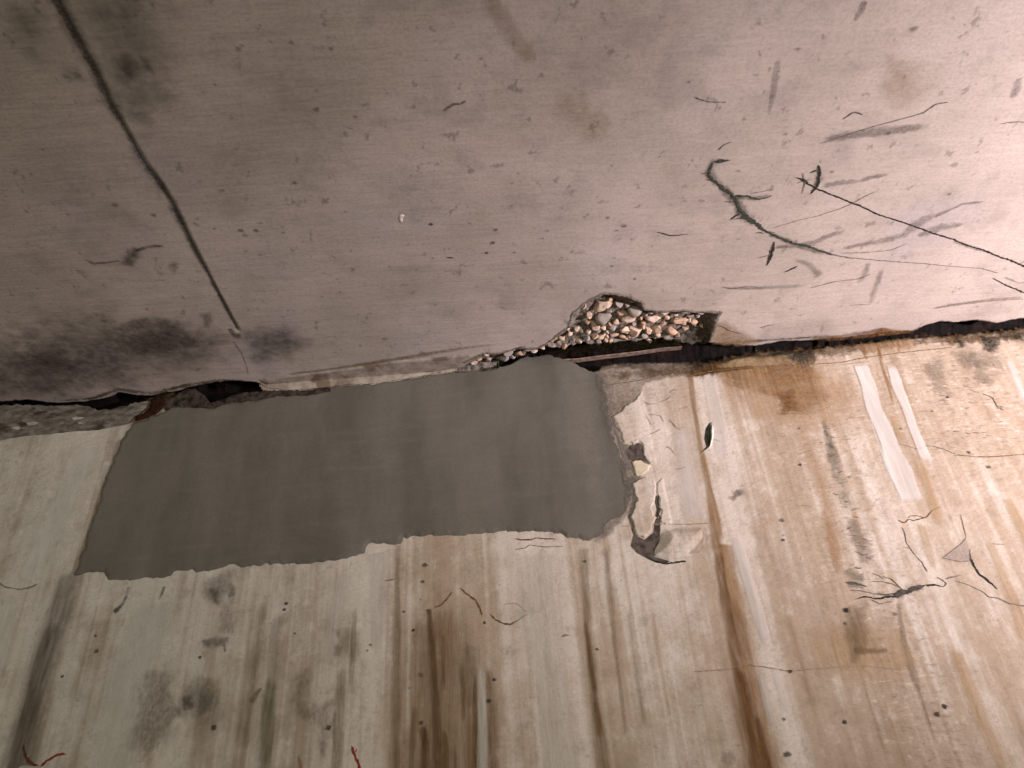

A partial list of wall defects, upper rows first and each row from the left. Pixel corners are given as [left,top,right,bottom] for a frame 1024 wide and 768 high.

crack [497,102,1024,385]
spalling [0,394,173,441]
crack [0,373,434,410]
spalling [439,292,722,374]
peeling [596,363,686,563]
corrosion [689,328,825,469]
corrosion [814,328,910,356]
crack [846,507,1024,606]
crack [435,588,528,625]
corrosion [708,483,773,768]